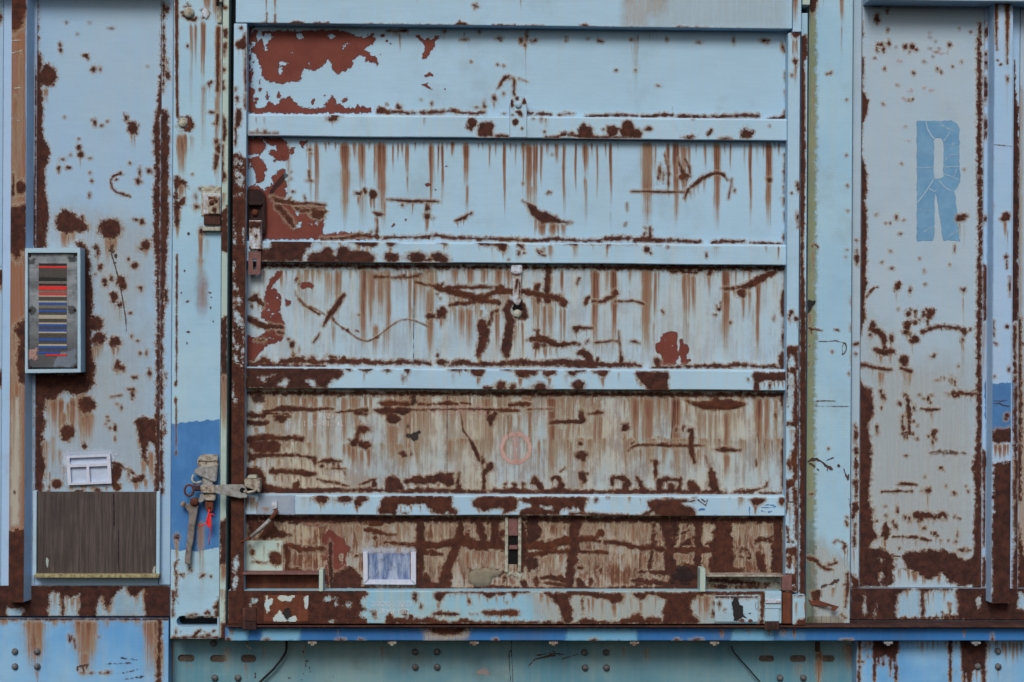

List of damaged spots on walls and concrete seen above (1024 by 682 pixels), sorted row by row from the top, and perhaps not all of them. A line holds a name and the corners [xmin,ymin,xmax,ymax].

peeling [249,26,391,115]
rust [0,0,819,682]
peeling [655,331,691,366]
rust [832,4,1024,682]